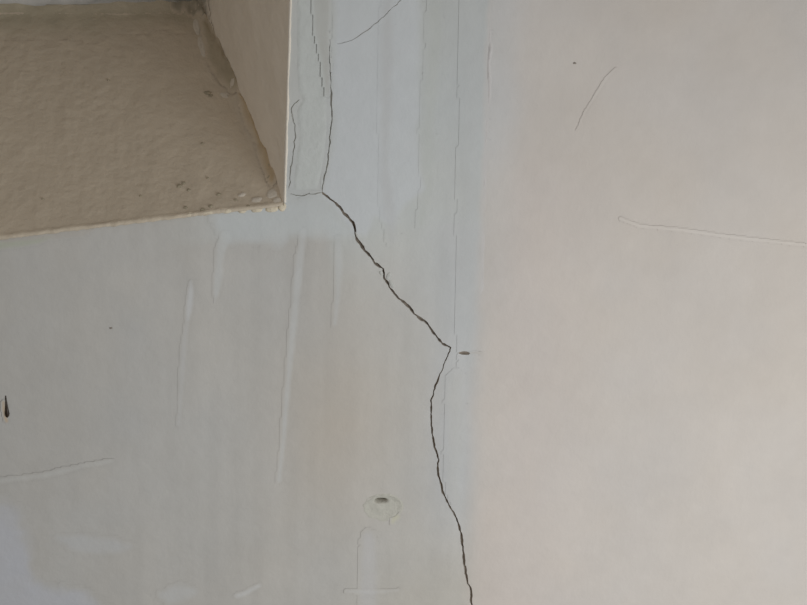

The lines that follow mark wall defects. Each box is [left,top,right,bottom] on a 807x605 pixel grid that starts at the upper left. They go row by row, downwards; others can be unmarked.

crack [289,0,473,605]